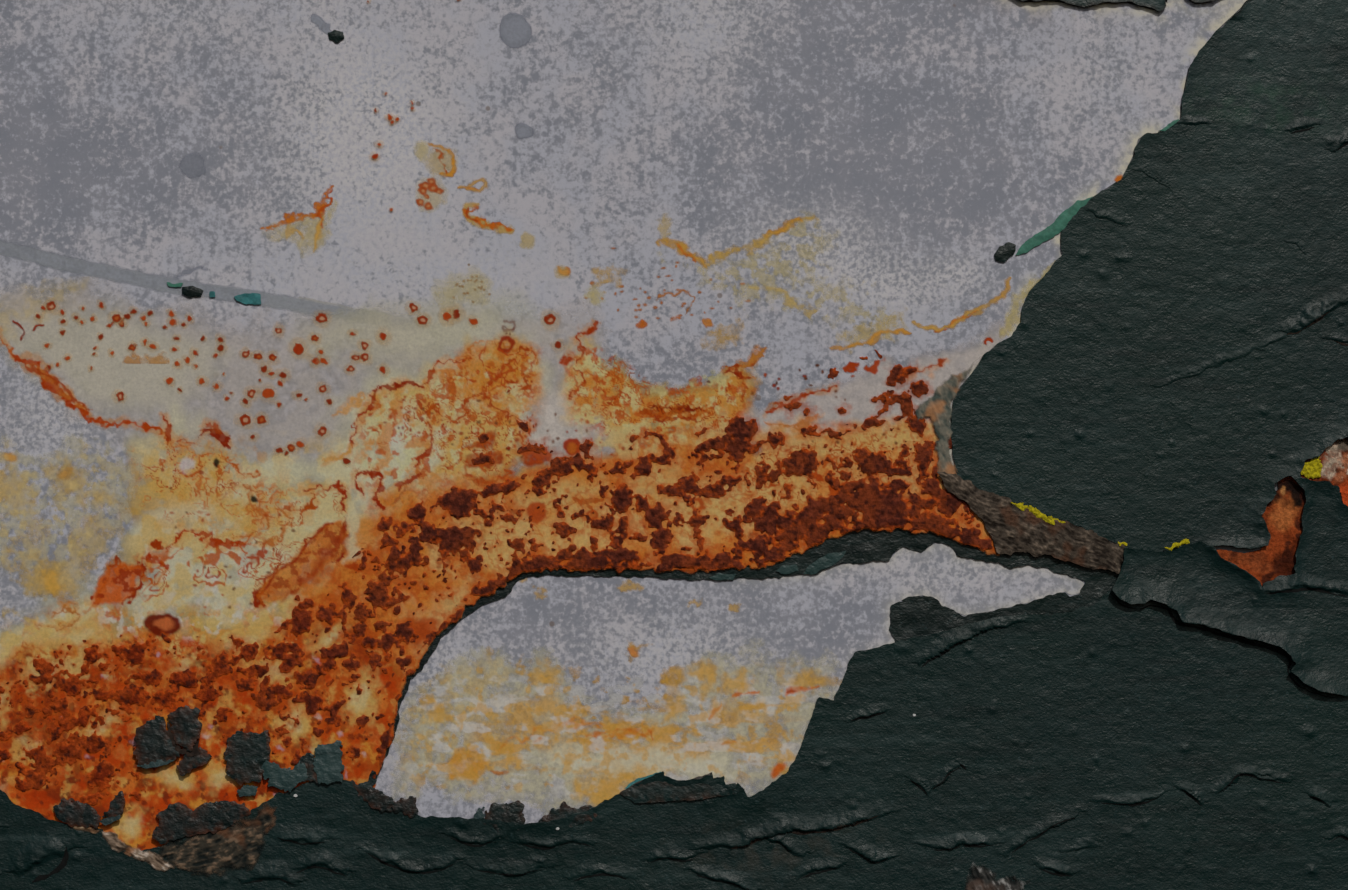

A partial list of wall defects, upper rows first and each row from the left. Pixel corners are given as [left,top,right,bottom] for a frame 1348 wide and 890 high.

peeling [0,0,1247,453]
corrosion [585,216,847,343]
peeling [0,341,157,632]
peeling [53,791,125,829]
corrosion [0,264,1049,875]
peeling [133,542,1085,844]